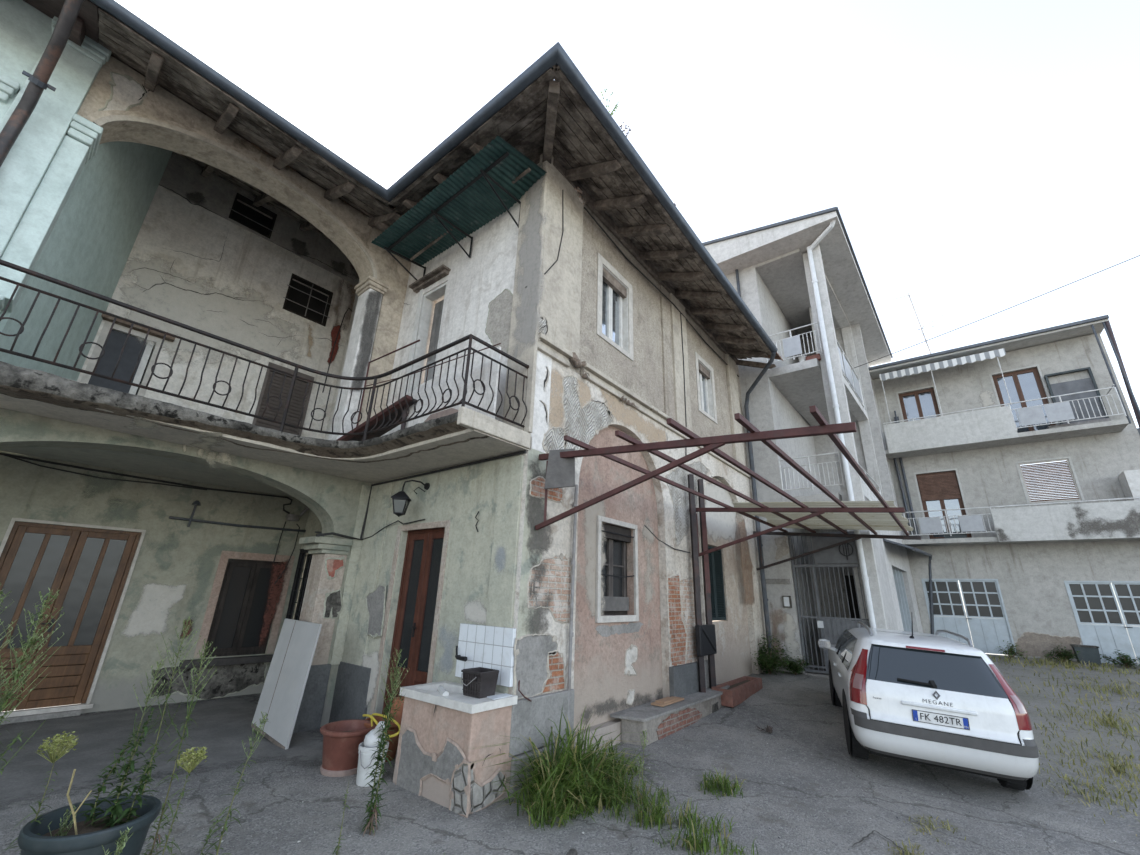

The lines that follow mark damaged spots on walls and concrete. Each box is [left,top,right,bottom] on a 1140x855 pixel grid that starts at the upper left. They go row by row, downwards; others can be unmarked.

crack [130,185,342,346]
spalling [0,385,489,463]
peeling [542,374,614,453]
spalling [323,556,345,619]
spalling [362,584,387,705]
flaking render [527,553,572,624]
flaking render [541,650,566,695]
peeling [624,644,638,706]
flaking render [667,574,697,667]
spalling [395,727,478,796]